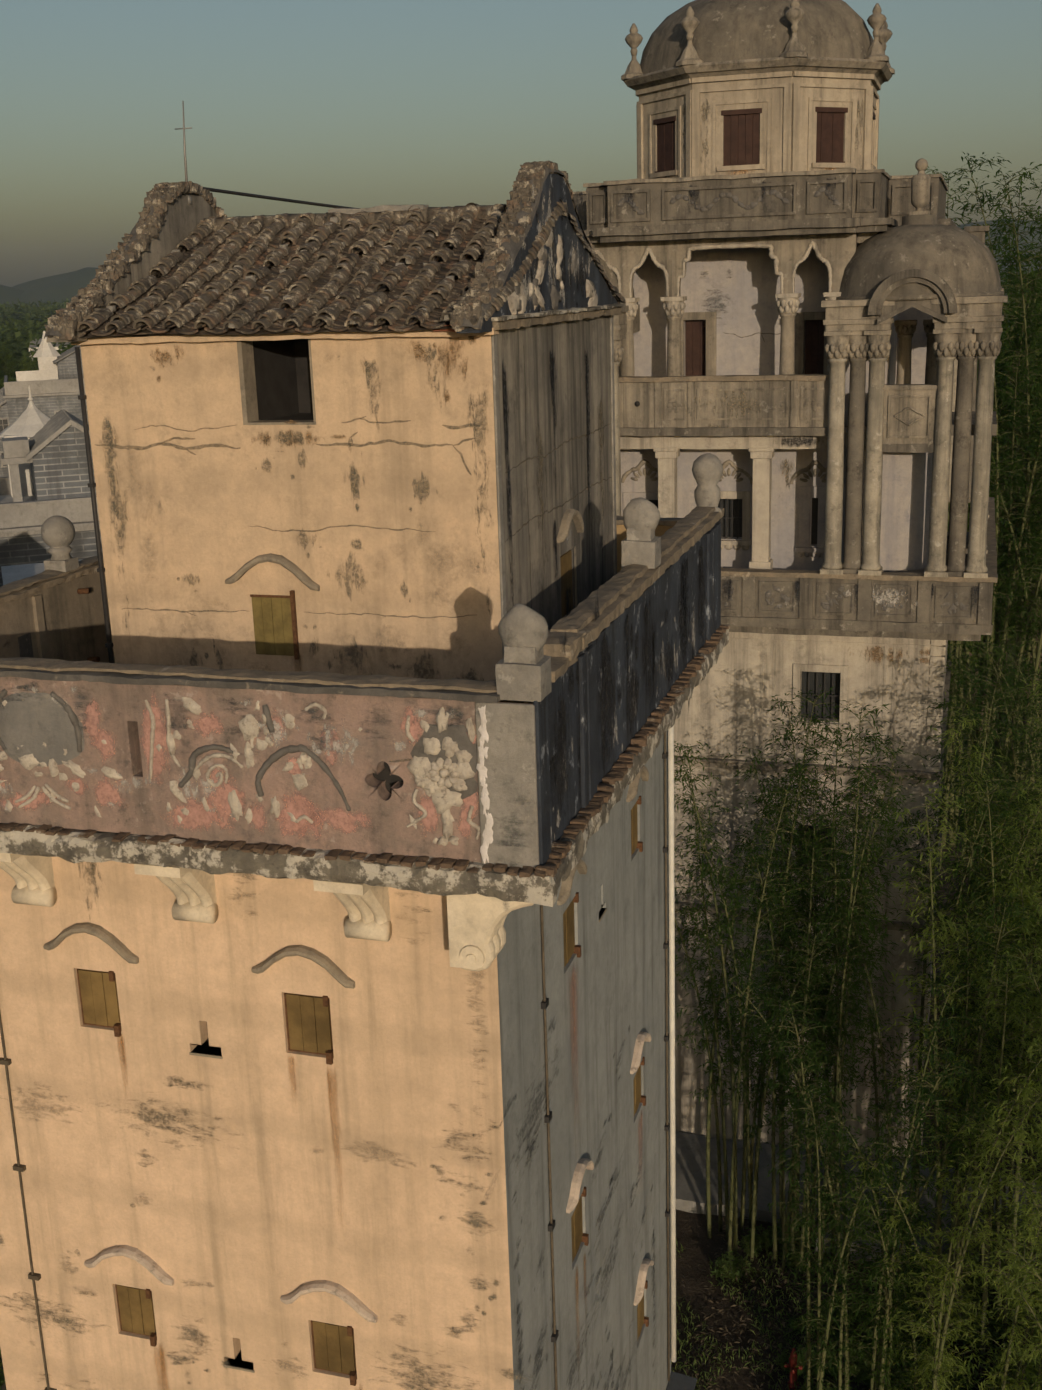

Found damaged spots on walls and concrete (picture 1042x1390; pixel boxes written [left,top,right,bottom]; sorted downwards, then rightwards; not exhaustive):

leakage [101,419,128,537]
crack [95,425,240,455]
peeling [0,695,367,837]
peeling [409,705,493,864]
leakage [138,1100,211,1138]